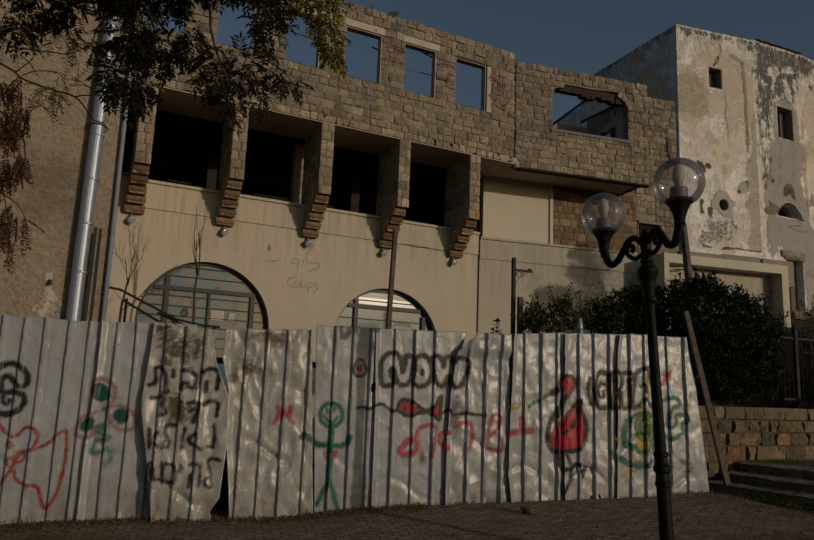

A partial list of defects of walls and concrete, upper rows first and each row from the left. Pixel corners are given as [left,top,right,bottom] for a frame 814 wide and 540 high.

peeling [632,40,796,252]
damp [637,25,814,189]